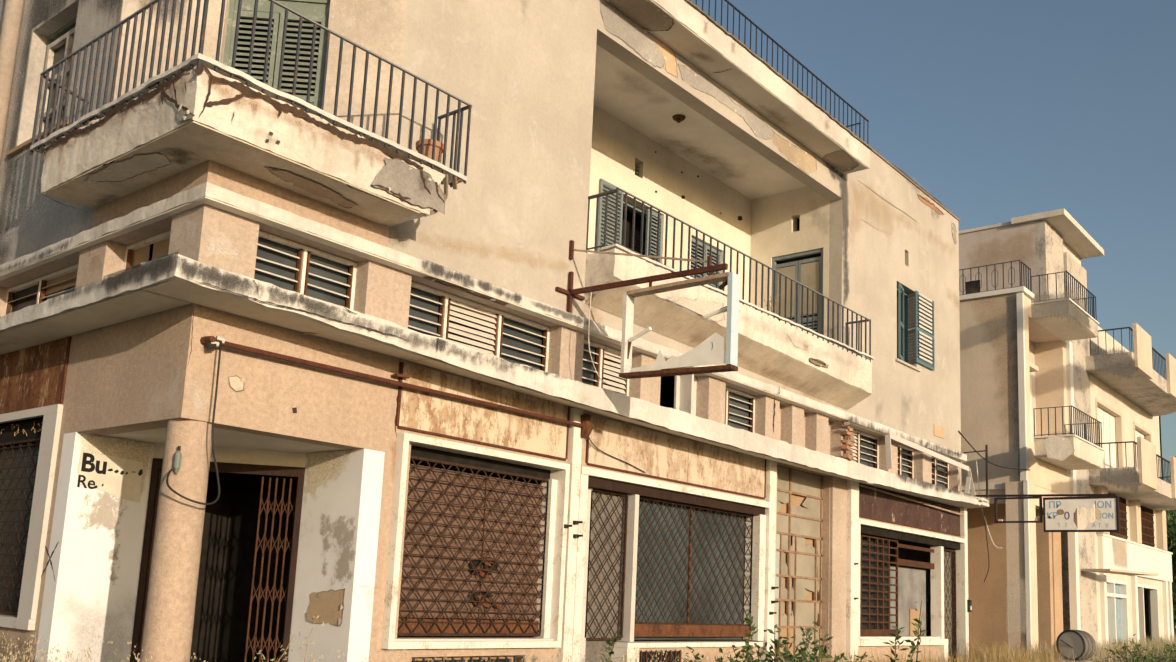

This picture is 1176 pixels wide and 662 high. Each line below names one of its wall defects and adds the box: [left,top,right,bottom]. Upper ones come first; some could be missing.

peeling [600,0,859,173]
spalling [371,158,445,214]
rust [200,336,583,428]
peeling [85,493,122,580]
peeling [306,515,355,626]